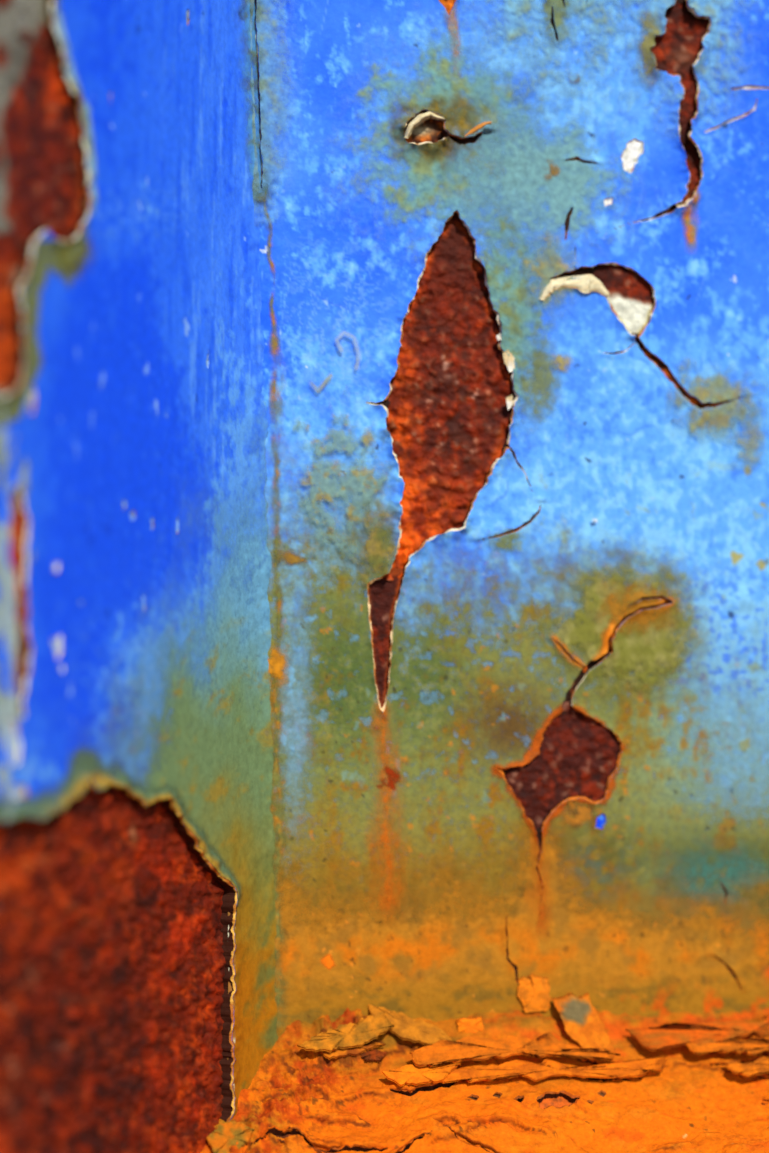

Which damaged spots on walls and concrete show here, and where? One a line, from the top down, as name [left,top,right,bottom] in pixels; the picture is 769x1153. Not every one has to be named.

crack [531,0,598,52]
peeling [0,0,100,424]
corrosion [264,202,274,270]
corrosion [270,297,278,355]
peeling [538,0,724,340]
peeling [361,205,535,712]
corrosion [268,442,769,1086]
peeling [0,761,238,1153]
corrosion [206,1120,255,1153]
crack [201,956,769,1153]
crack [505,915,518,983]
crack [535,828,543,916]